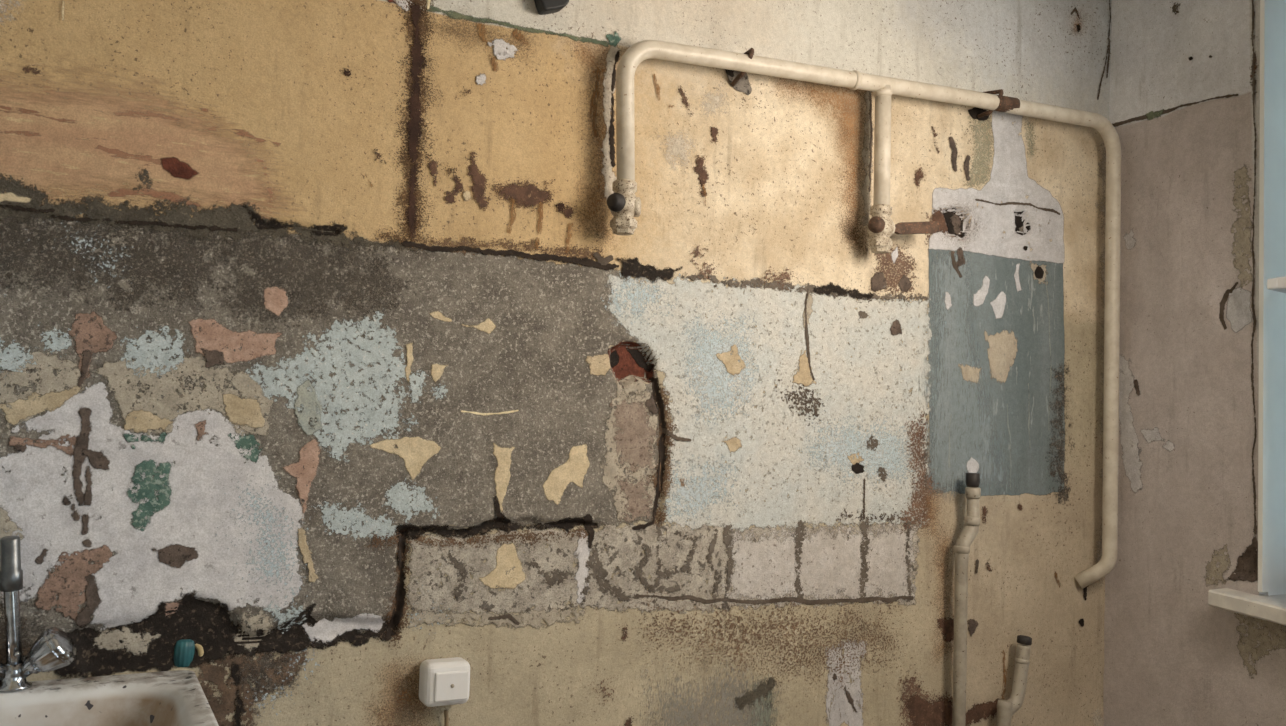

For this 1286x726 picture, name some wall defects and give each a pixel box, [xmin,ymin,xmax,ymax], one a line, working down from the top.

peeling [161,157,199,179]
leakage [0,0,443,254]
leakage [777,78,868,250]
peeling [931,107,989,181]
peeling [958,263,1021,383]
crack [1071,0,1259,535]
peeling [0,202,952,726]
crack [364,378,691,650]
peeling [967,457,979,473]
spalling [1204,526,1258,585]